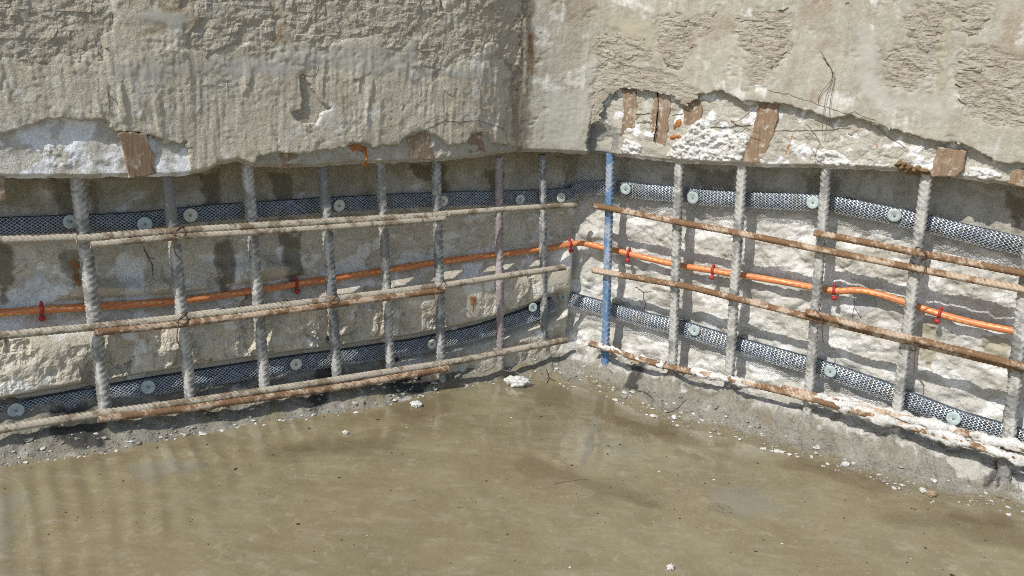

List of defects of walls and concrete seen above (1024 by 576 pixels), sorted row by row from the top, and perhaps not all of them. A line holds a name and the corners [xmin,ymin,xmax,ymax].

spalling [584,0,1024,186]
crack [770,50,904,147]
spalling [0,118,128,179]
spalling [135,132,191,177]
rust [348,143,368,166]
spalling [253,130,518,168]
rust [70,261,81,286]